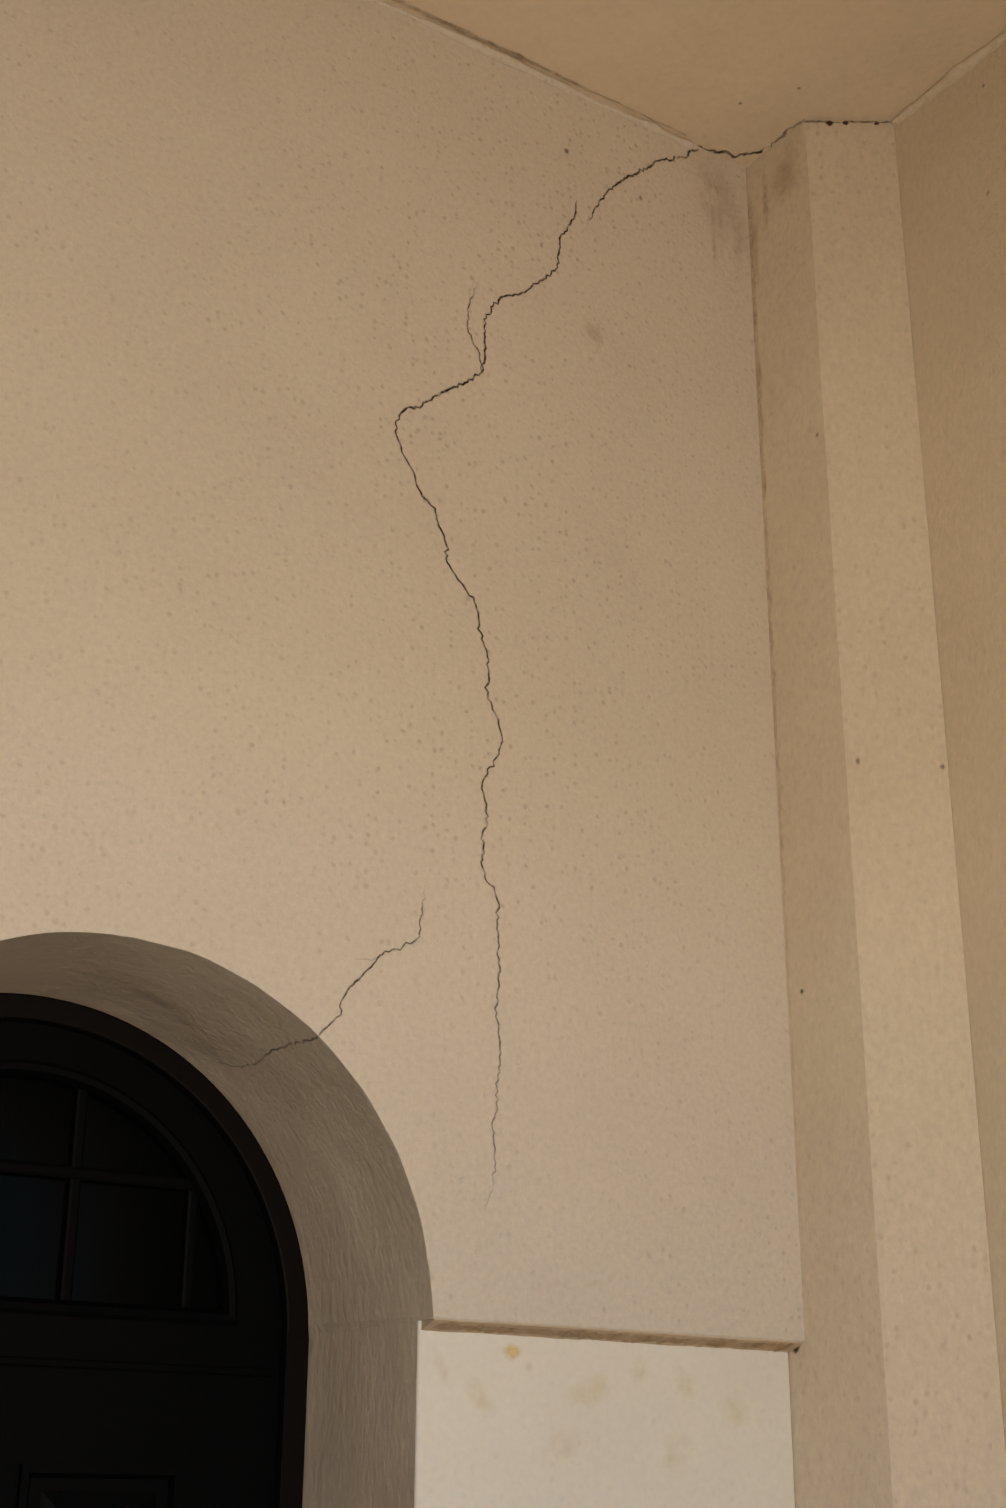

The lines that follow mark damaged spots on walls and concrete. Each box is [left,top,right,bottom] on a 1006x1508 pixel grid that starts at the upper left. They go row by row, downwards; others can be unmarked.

crack [270,919,421,1052]
crack [395,119,888,1173]